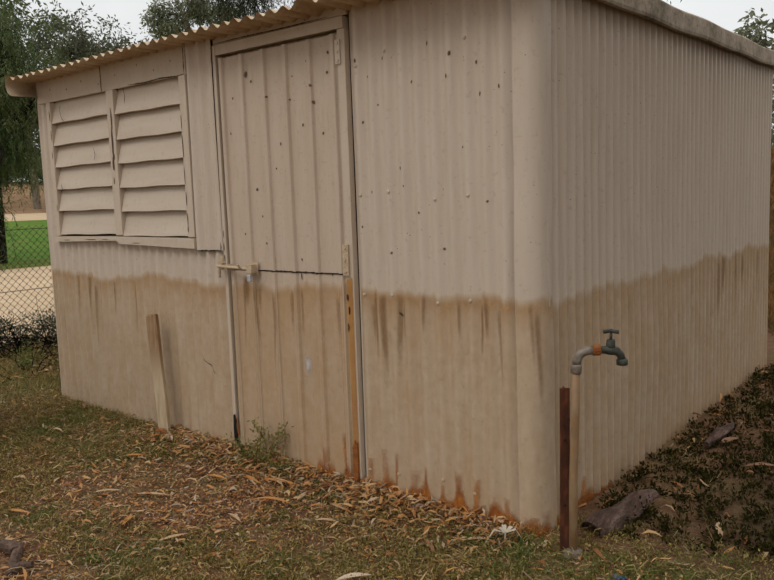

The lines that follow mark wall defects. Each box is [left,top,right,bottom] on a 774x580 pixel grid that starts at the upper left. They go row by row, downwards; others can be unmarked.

water stain [347,278,359,447]
rust [408,475,560,537]